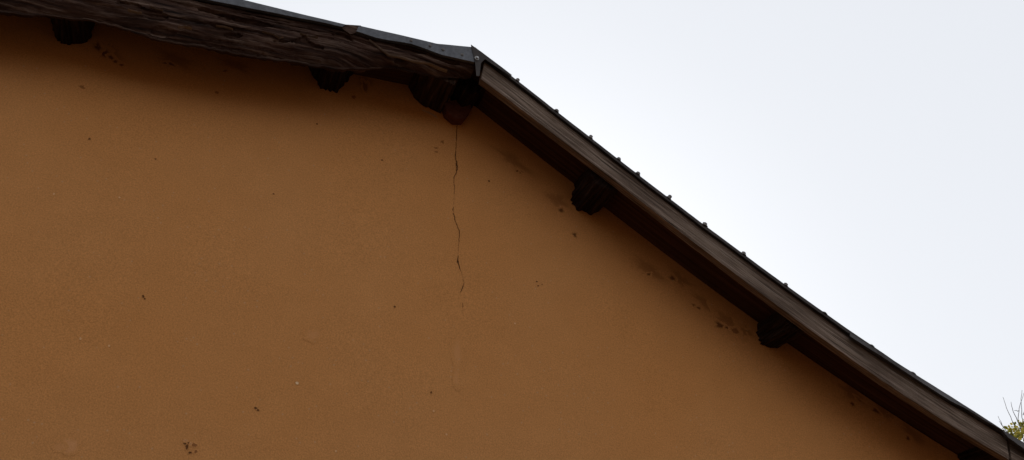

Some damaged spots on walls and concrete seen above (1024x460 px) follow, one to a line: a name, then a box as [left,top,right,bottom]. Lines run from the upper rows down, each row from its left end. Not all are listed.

crack [452,125,465,309]